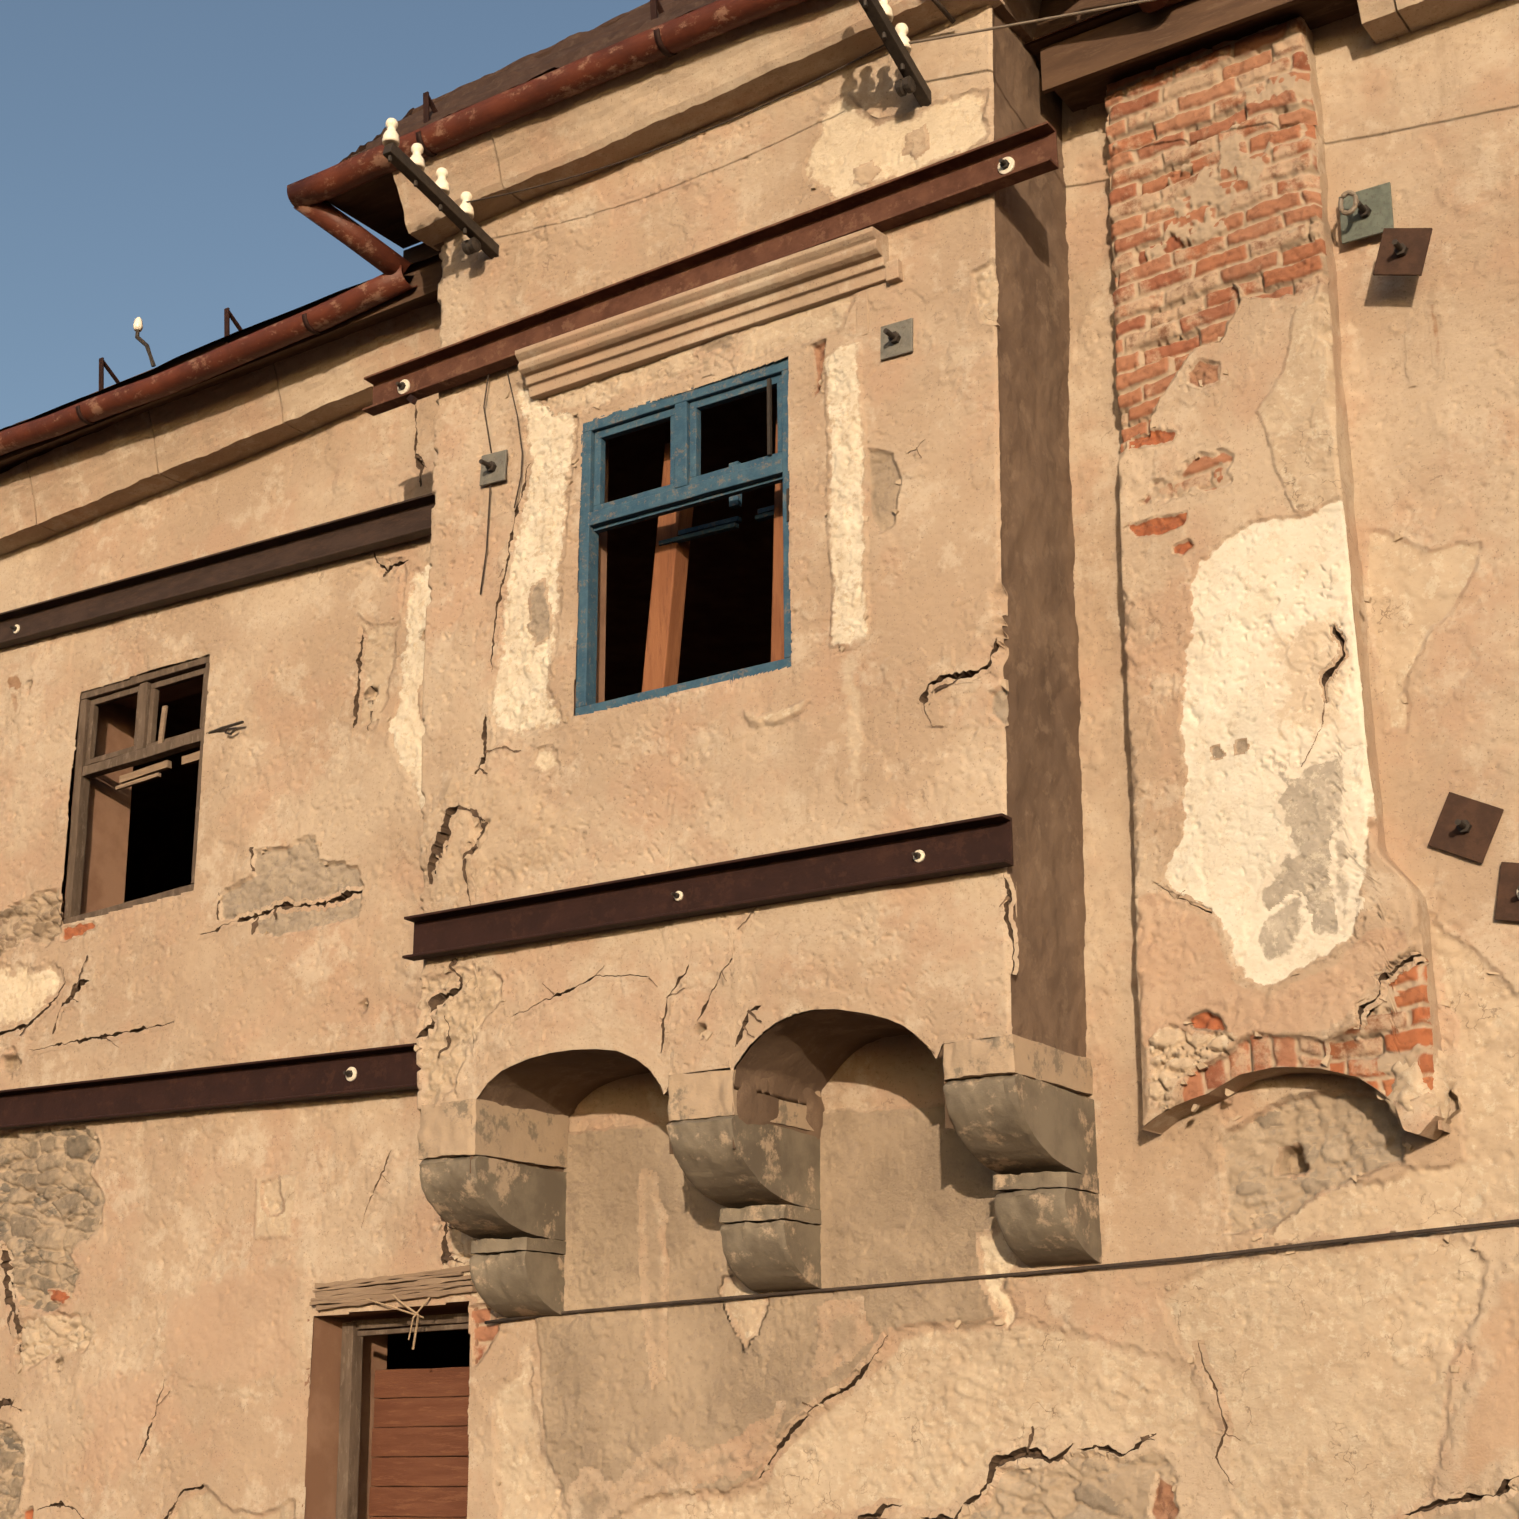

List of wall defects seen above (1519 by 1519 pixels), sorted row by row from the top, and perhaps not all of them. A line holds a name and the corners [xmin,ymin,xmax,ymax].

flaking render [1104,16,1329,455]
peeling [487,292,902,779]
crack [425,714,521,905]
crack [915,637,1008,727]
peeling [1123,447,1482,989]
crack [1301,623,1349,767]
flaking render [414,963,506,1109]
flaking render [0,1124,105,1374]
peeling [623,910,1519,1519]
crack [752,1330,893,1486]
crack [821,1426,1160,1519]
crack [1400,1468,1519,1519]